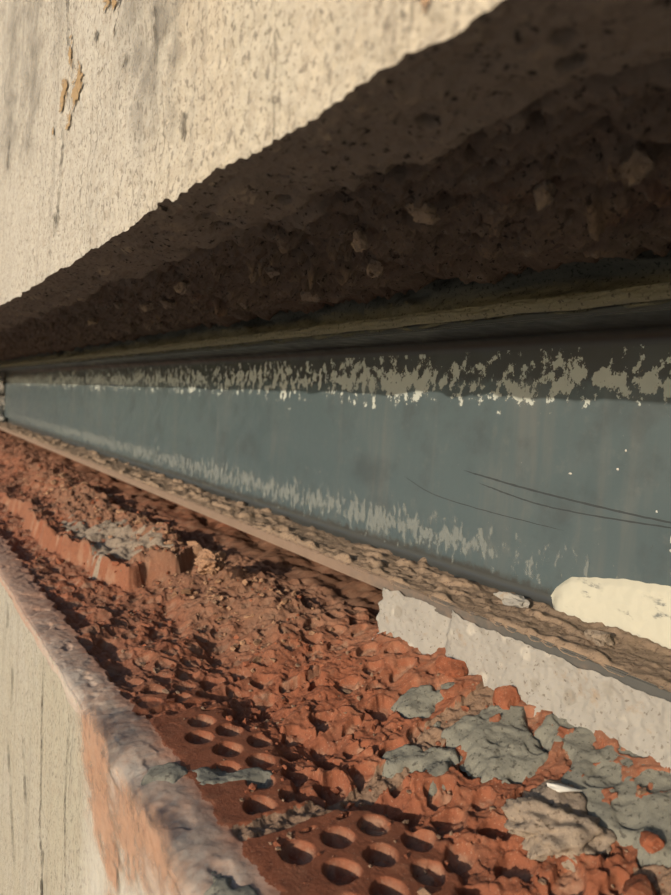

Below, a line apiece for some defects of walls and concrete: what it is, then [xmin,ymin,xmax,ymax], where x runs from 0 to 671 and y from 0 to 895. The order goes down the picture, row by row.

spalling [351,226,384,278]
peeling [7,344,671,413]
peeling [7,412,590,585]
spalling [434,657,469,678]
spalling [492,685,521,710]
peeling [547,783,582,793]
spalling [639,831,665,854]